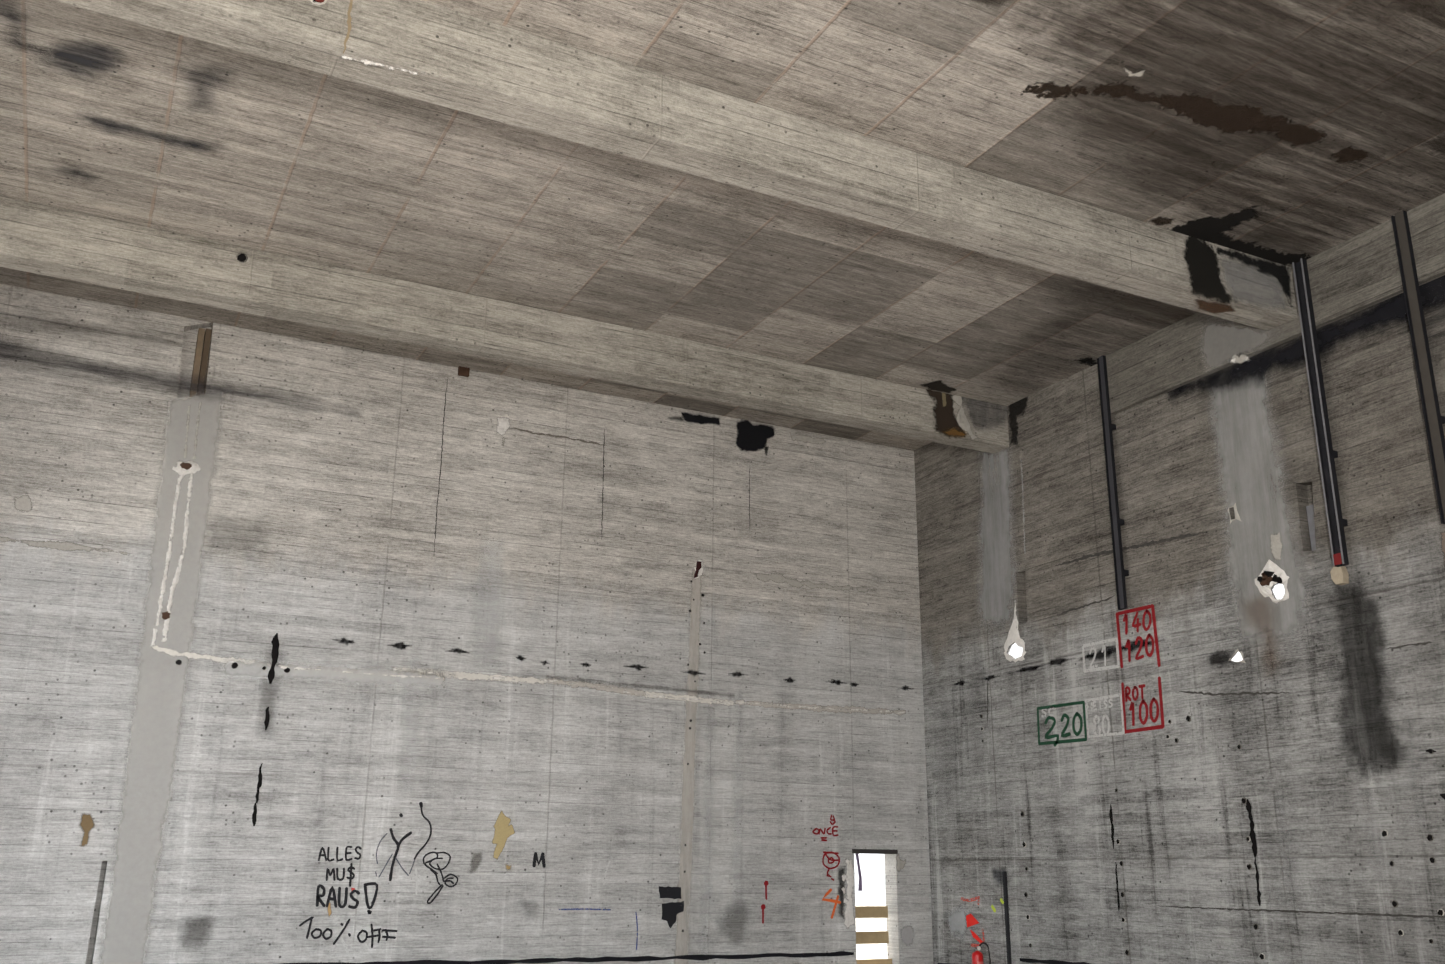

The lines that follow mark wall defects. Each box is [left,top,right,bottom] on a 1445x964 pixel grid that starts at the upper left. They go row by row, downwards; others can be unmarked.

water stain [1338,585,1401,770]